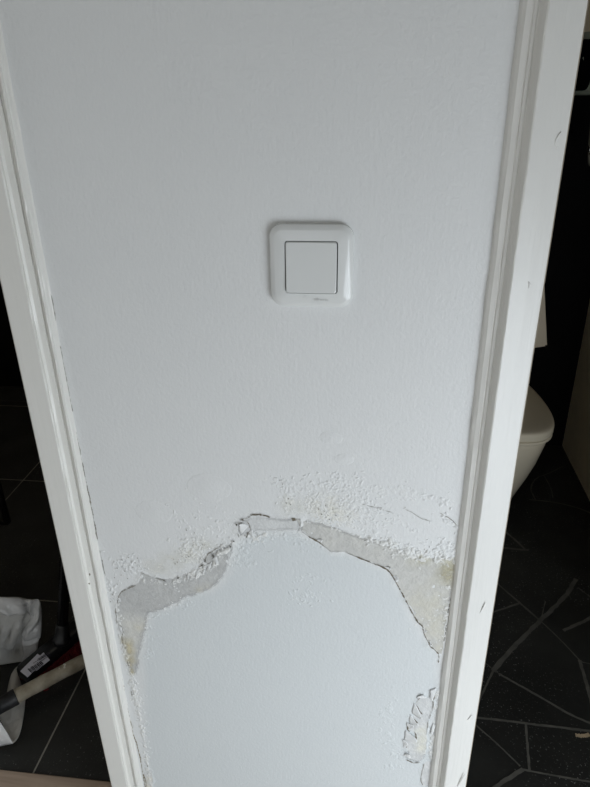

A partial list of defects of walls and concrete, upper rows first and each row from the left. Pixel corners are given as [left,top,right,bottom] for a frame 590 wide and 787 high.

peeling [110,509,456,787]